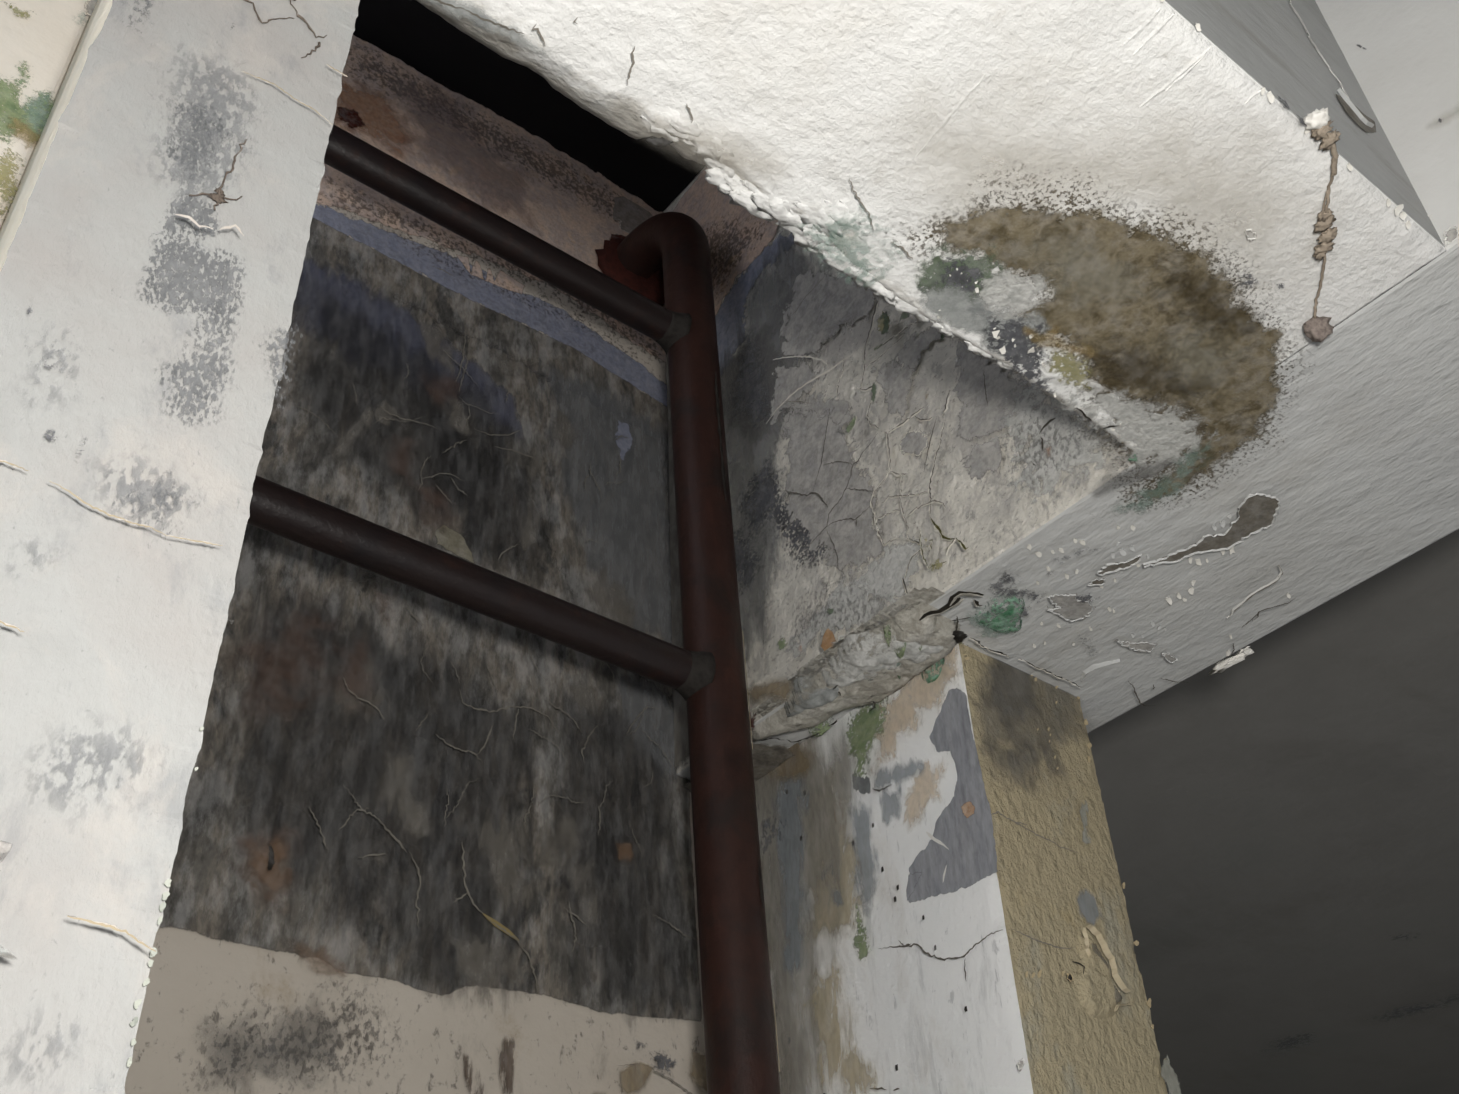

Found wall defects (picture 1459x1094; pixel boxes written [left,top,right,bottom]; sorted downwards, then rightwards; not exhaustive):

damp [141,194,244,423]
damp [256,218,683,648]
damp [720,240,829,659]
crack [783,298,1081,688]
damp [907,179,1295,509]
spalling [1027,493,1280,648]
damp [212,1007,374,1073]
damp [159,524,702,1021]
peeling [804,818,862,938]
peeling [852,647,997,902]
crack [879,929,1074,980]
peeling [1161,1056,1181,1094]